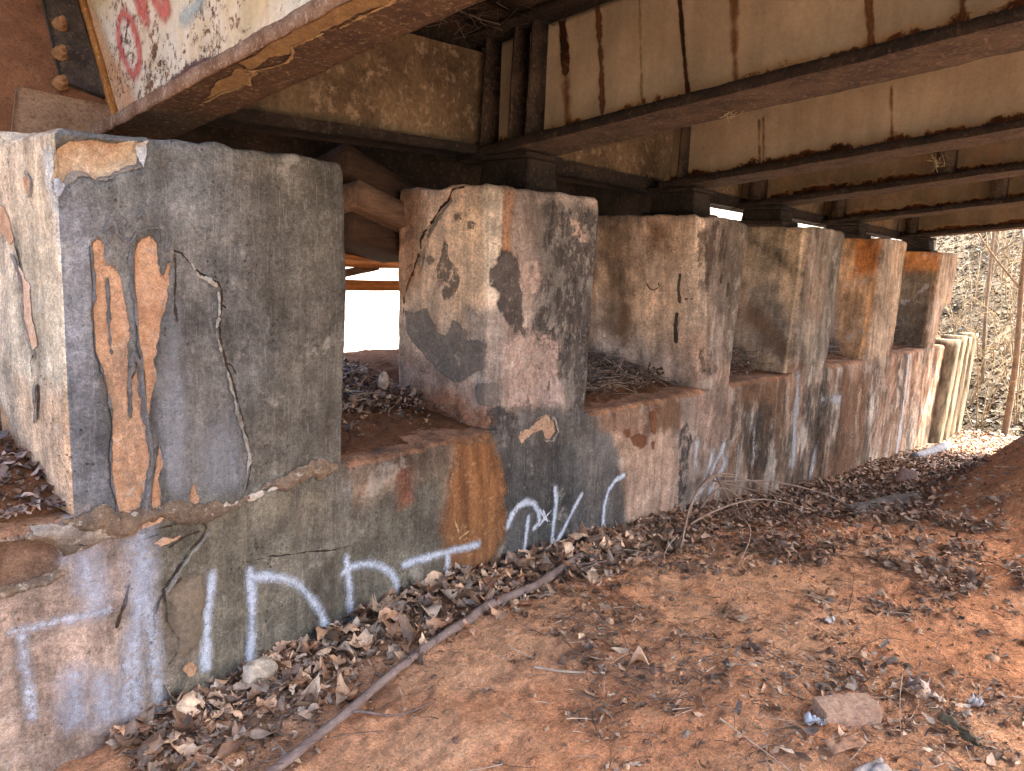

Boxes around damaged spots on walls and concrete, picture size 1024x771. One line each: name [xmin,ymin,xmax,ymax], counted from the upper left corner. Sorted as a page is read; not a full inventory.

peeling [199,0,397,105]
rust [558,18,571,125]
rust [678,0,690,93]
spalling [50,137,149,197]
crack [403,185,465,314]
spalling [0,205,338,598]
crack [174,250,252,489]
rust [440,432,507,576]
leakage [485,200,598,444]
leakage [624,404,726,508]
leakage [791,376,841,480]
crack [115,523,211,664]